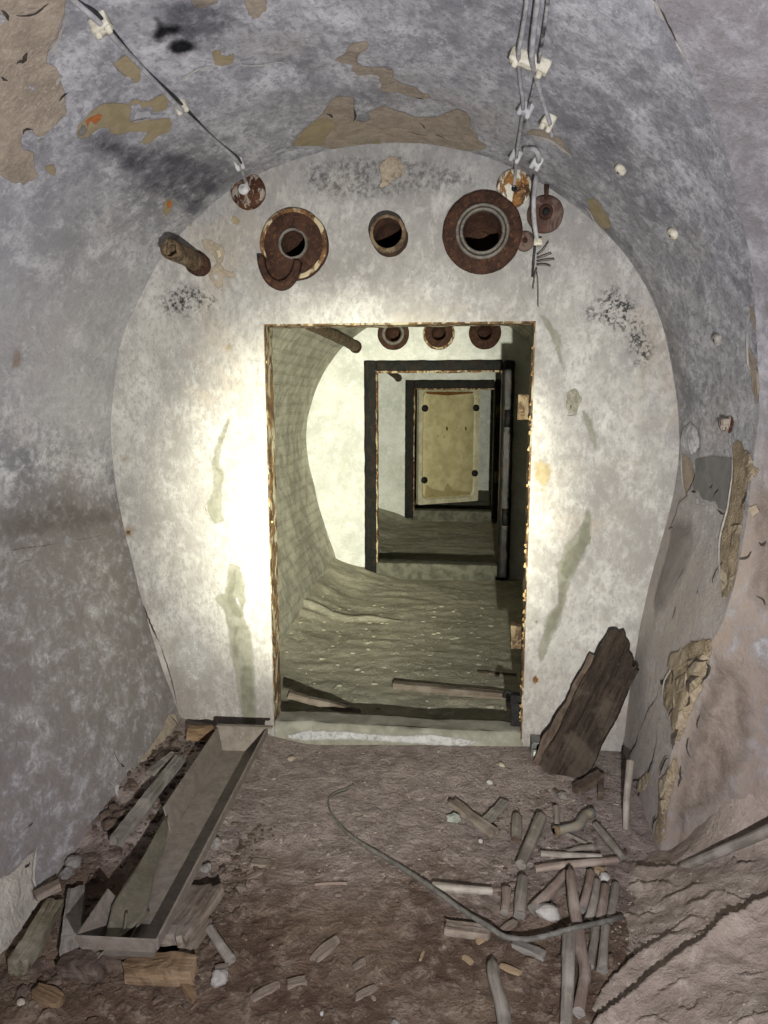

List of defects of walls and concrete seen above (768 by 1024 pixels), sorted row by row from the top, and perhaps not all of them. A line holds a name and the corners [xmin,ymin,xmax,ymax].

peeling [0,0,69,185]
peeling [76,95,172,145]
peeling [335,41,430,100]
peeling [292,96,486,151]
corrosion [260,208,327,279]
corrosion [369,214,406,253]
mould [589,293,649,360]
leakage [208,422,229,522]
flaking render [718,440,768,606]
leakage [539,514,590,660]
leakage [216,564,256,724]
flaking render [652,639,712,845]